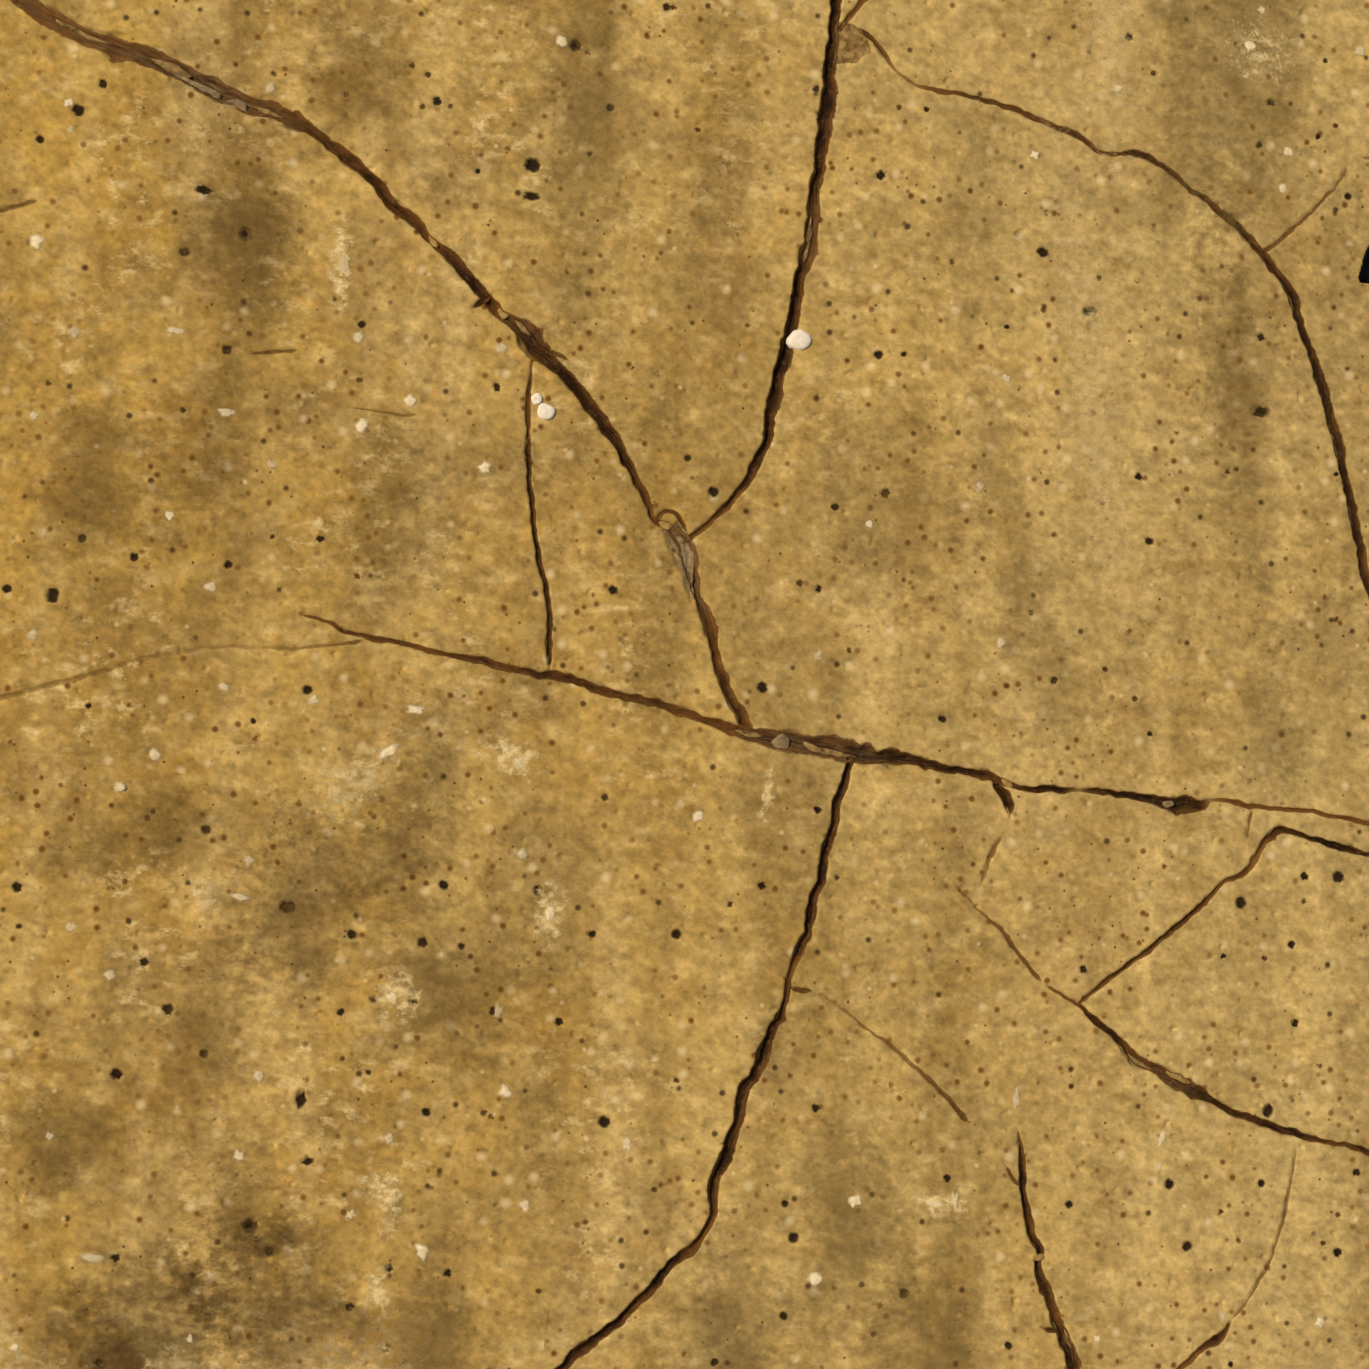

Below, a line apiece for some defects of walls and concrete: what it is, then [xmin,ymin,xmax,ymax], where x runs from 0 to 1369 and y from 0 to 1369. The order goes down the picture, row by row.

crack [0,203,24,212]
crack [914,83,1369,597]
spalling [1359,247,1369,282]
crack [11,0,1082,1369]
crack [1082,787,1369,834]
crack [986,826,1369,1156]
damp [81,1273,209,1369]
crack [1177,1192,1289,1369]